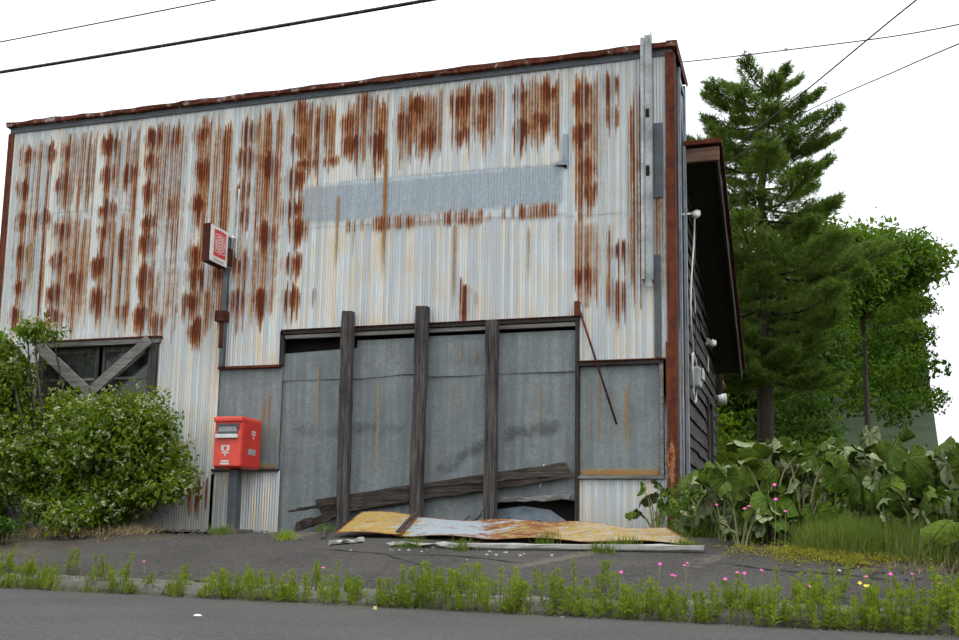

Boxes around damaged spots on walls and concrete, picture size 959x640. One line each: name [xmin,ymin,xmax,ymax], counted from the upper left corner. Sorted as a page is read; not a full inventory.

rust [7,67,641,350]